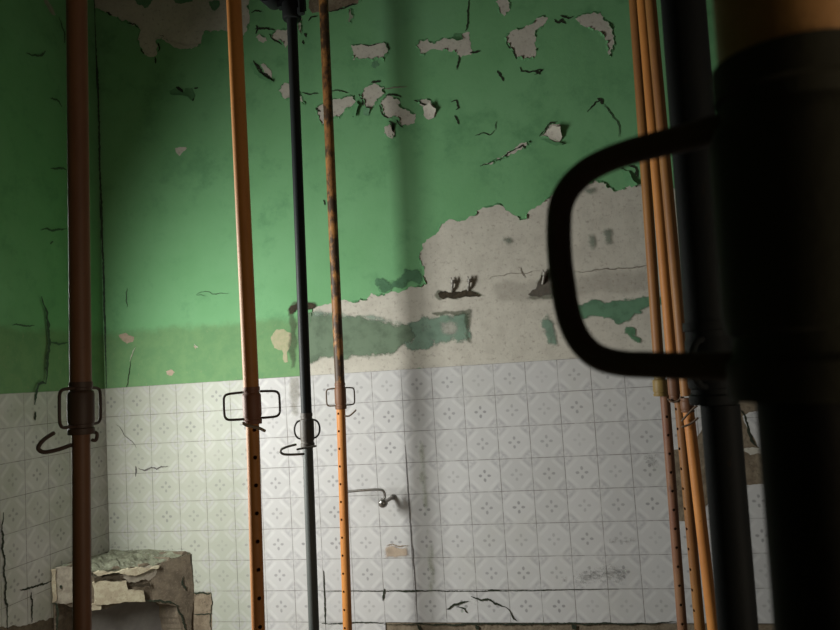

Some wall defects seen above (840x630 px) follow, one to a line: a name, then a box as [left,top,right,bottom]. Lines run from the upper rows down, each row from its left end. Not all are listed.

peeling [93,0,228,63]
peeling [241,0,288,48]
peeling [414,1,480,68]
peeling [504,15,548,61]
peeling [315,80,437,139]
crack [587,98,620,133]
peeling [308,196,577,375]
peeling [572,169,652,351]
crack [13,296,68,420]
peeling [271,329,291,363]
crack [321,451,597,625]
peeling [192,592,213,630]